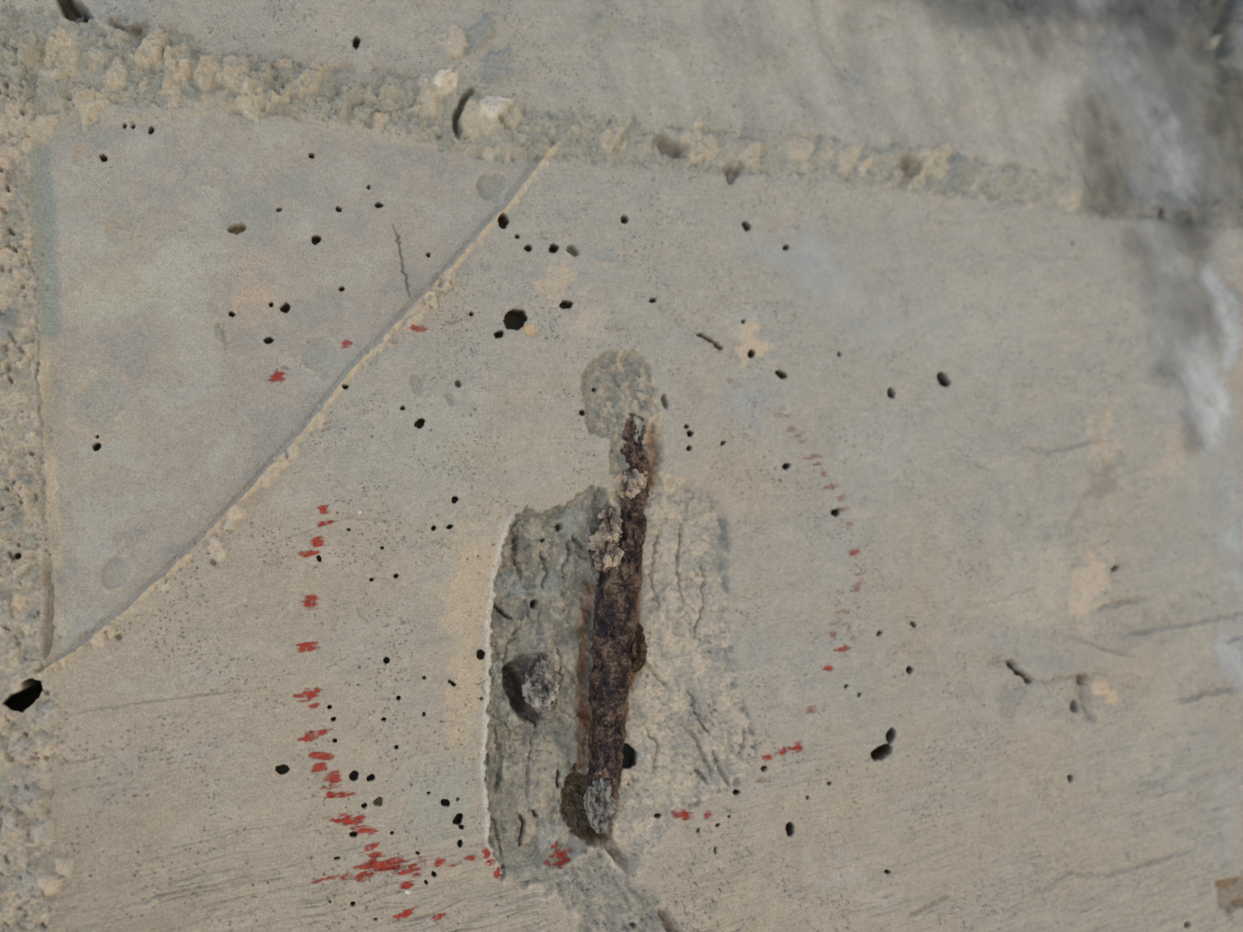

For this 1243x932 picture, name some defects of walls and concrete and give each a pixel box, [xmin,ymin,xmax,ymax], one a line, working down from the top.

spalling [482,346,761,932]
rust [630,597,648,684]
rust [579,703,602,766]